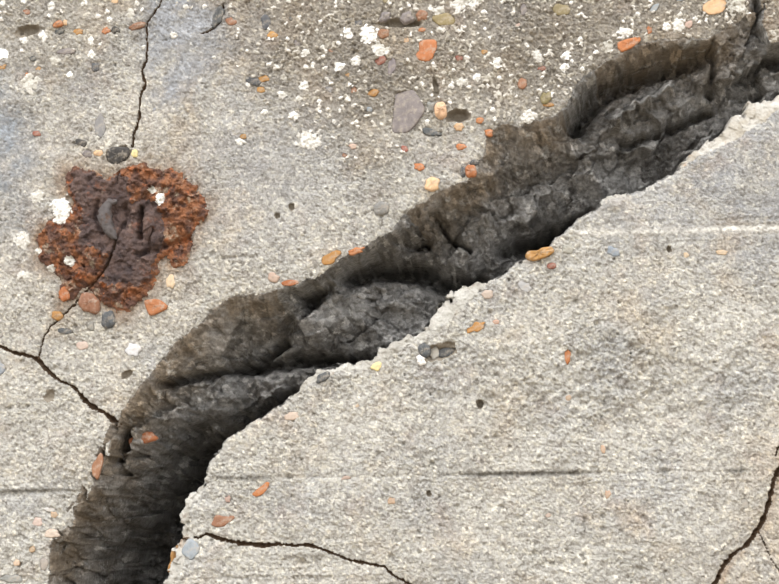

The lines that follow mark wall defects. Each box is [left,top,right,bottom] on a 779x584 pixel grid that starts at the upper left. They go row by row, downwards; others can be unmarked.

crack [131,0,162,147]
spalling [372,18,425,28]
corrosion [35,162,209,314]
spalling [186,26,779,478]
spalling [43,389,55,403]
crack [0,241,123,427]
spalling [163,539,187,584]
spalling [179,475,209,539]
crack [182,532,412,584]
crack [711,446,779,584]